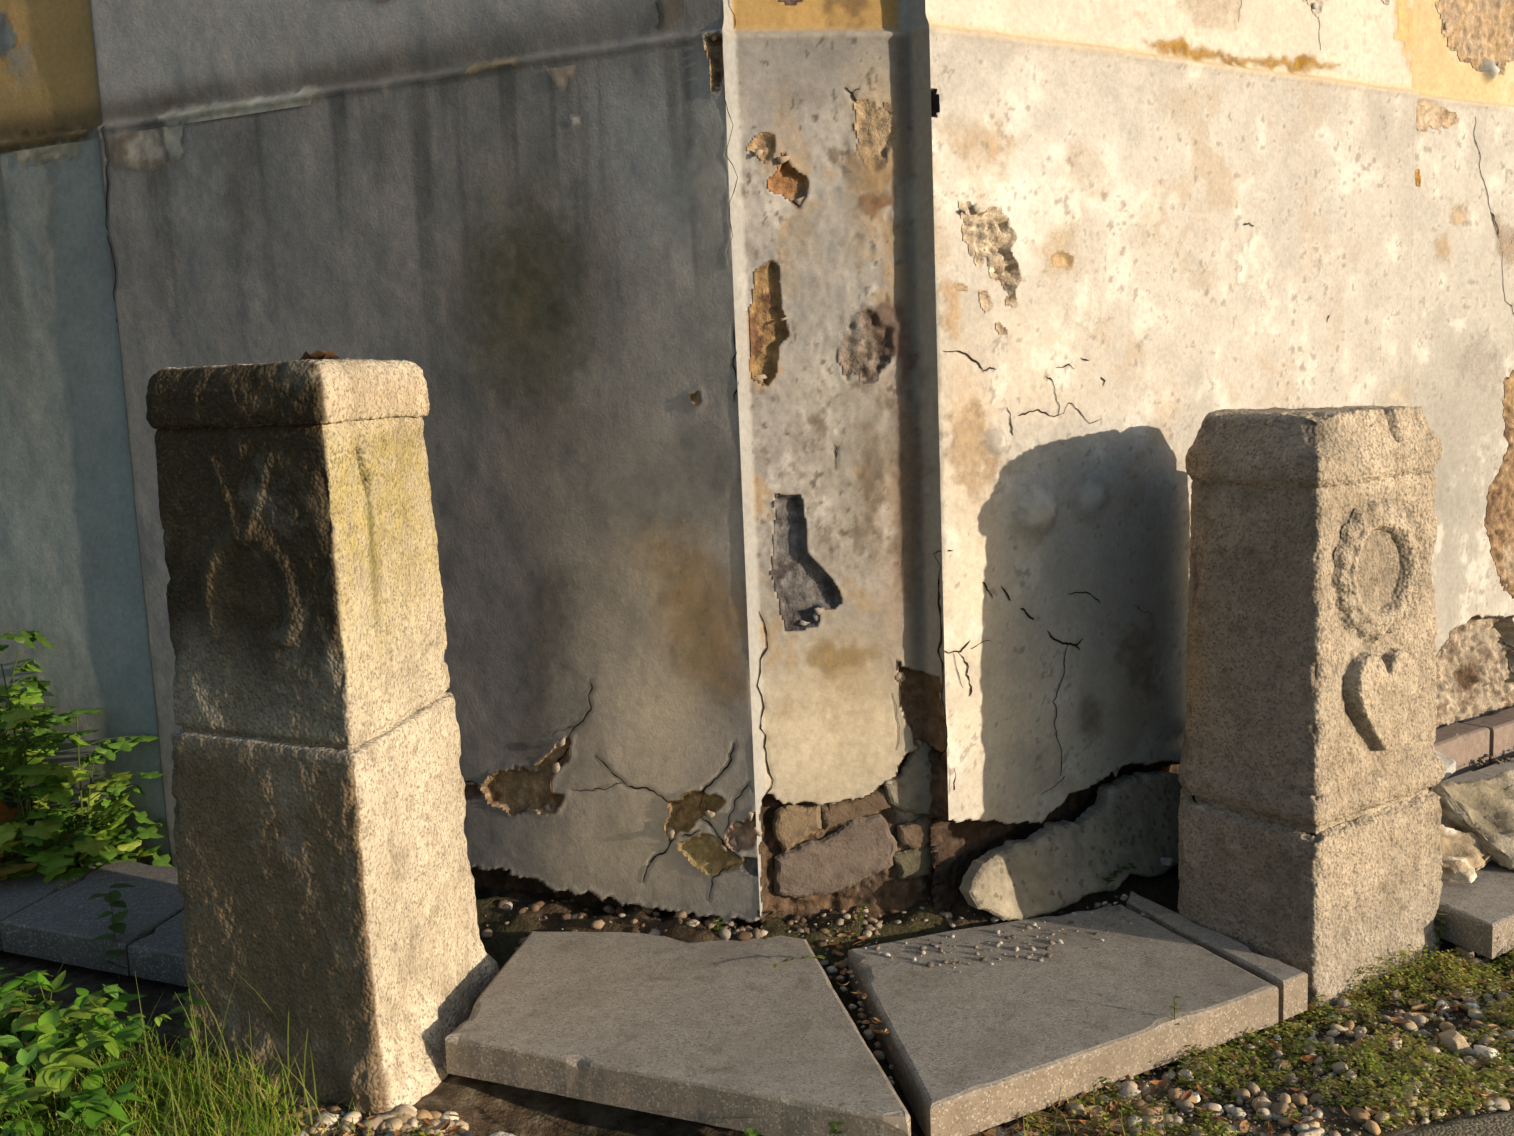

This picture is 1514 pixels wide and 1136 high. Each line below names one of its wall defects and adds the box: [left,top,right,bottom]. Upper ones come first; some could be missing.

leakage [104,129,170,172]
flaking render [749,260,790,386]
flaking render [747,132,809,209]
crack [945,350,996,371]
flaking render [955,201,1022,335]
crack [1007,358,1106,435]
crack [1474,117,1514,314]
flaking render [771,493,842,631]
flaking render [1435,370,1514,729]
crack [933,550,990,790]
crack [552,612,774,898]
flaking render [464,661,1180,926]